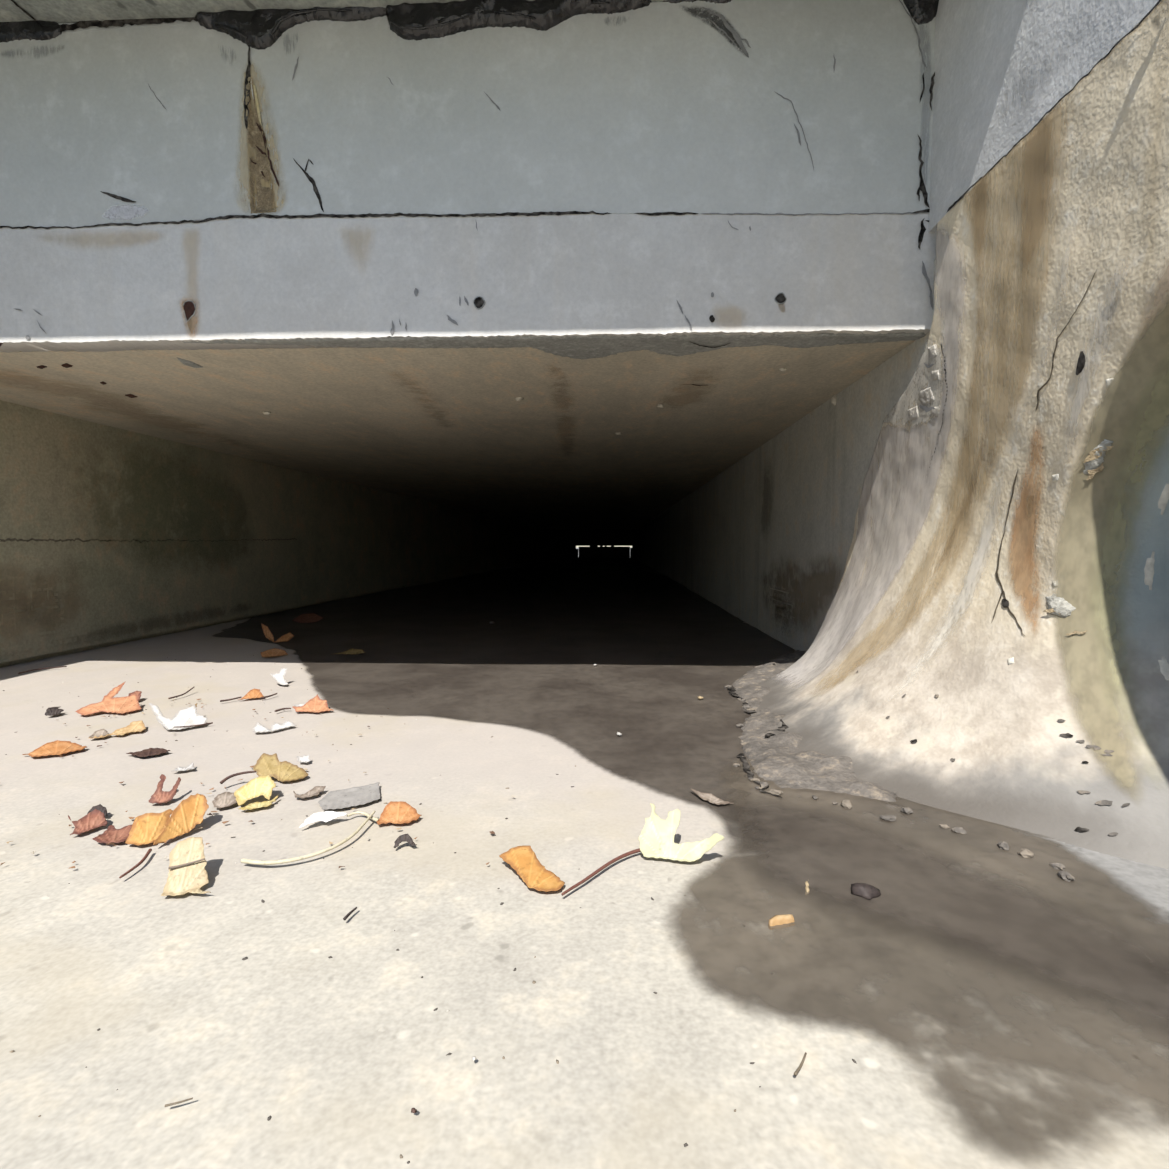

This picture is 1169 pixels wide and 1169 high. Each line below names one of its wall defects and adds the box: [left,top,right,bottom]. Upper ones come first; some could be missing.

spalling [246,68,279,214]
crack [0,0,1161,309]
crack [929,345,948,468]
rust [828,109,1061,687]
crack [1035,269,1097,412]
leakage [1070,274,1120,428]
leakage [916,482,1002,671]
crack [991,470,1026,637]
leakage [214,568,1169,1155]